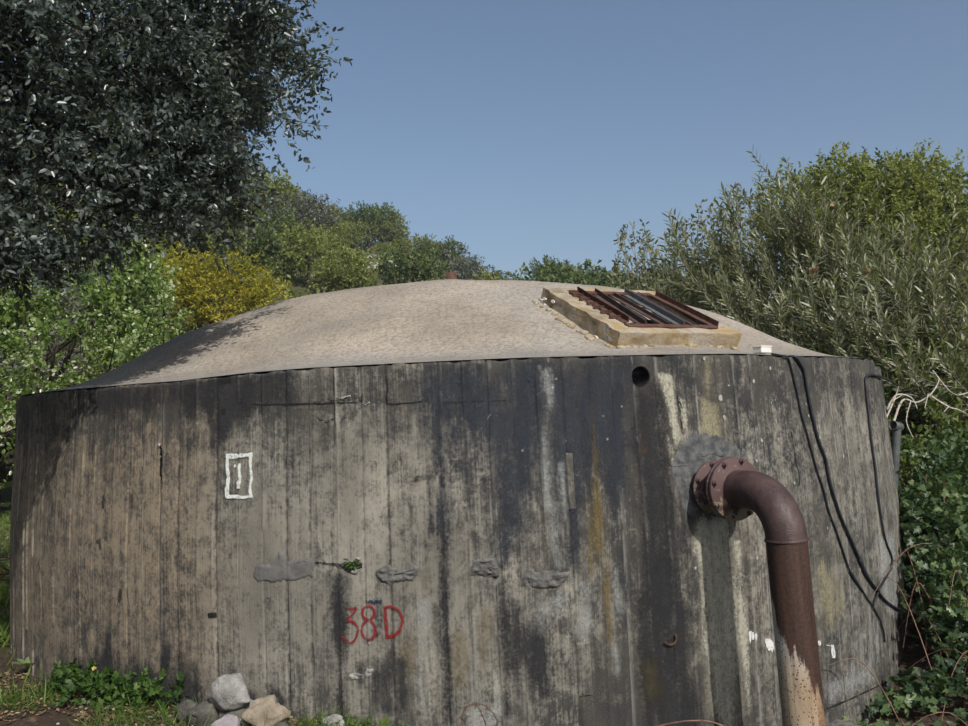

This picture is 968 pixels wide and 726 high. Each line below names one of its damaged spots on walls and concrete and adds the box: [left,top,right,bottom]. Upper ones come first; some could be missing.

damp [414,360,697,726]
damp [692,513,774,726]